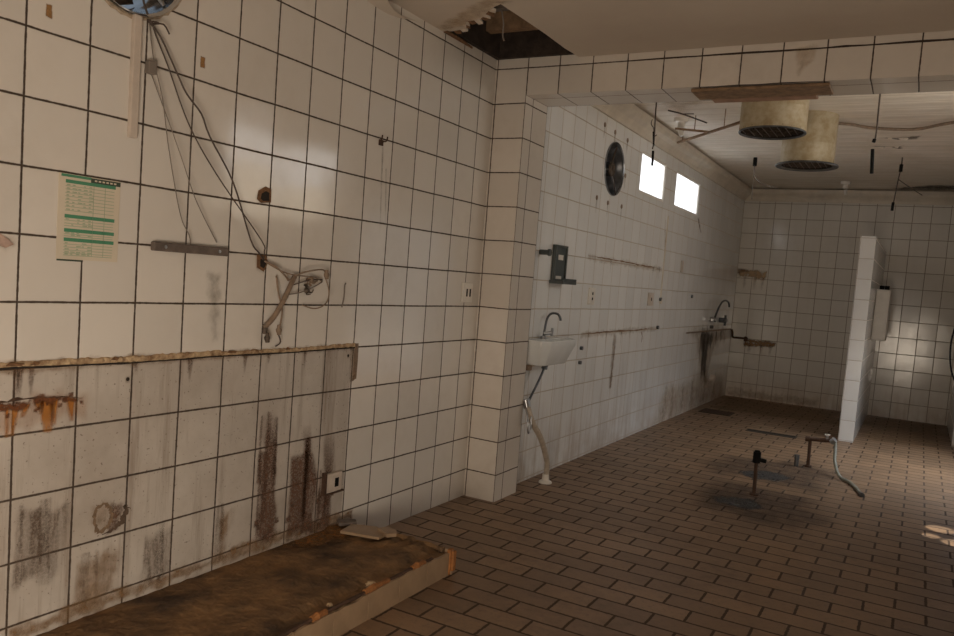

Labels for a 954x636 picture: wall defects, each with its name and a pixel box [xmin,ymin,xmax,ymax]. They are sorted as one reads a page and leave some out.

peeling [444,7,496,49]
water stain [701,332,722,377]
corrosion [0,392,83,436]
water stain [301,439,332,529]
water stain [92,502,131,535]